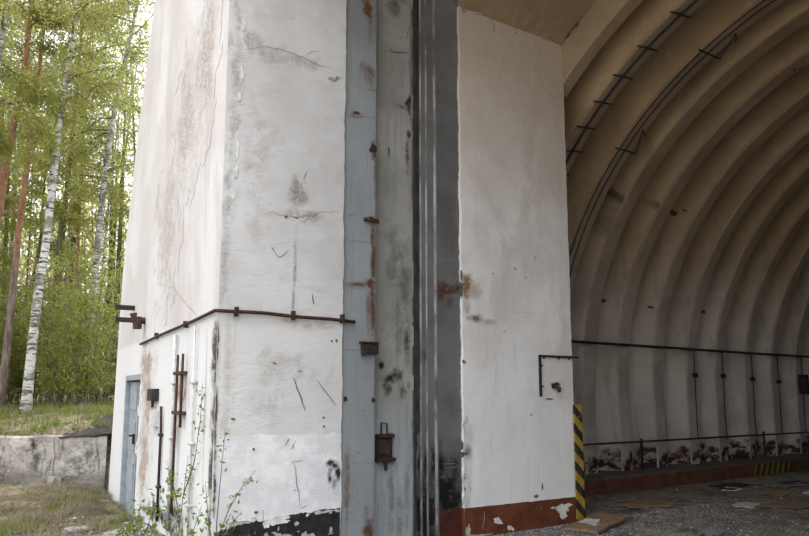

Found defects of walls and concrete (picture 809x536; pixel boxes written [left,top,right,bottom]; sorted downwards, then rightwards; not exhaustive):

crack [247,46,331,68]
water stain [152,0,342,326]
flaking render [205,0,341,536]
rust [343,222,375,342]
water stain [376,213,414,403]
rust [438,270,484,315]
water stain [25,438,45,475]
flaking render [135,334,190,536]
rust [341,420,374,536]
water stain [384,422,476,536]
peeling [551,503,573,519]